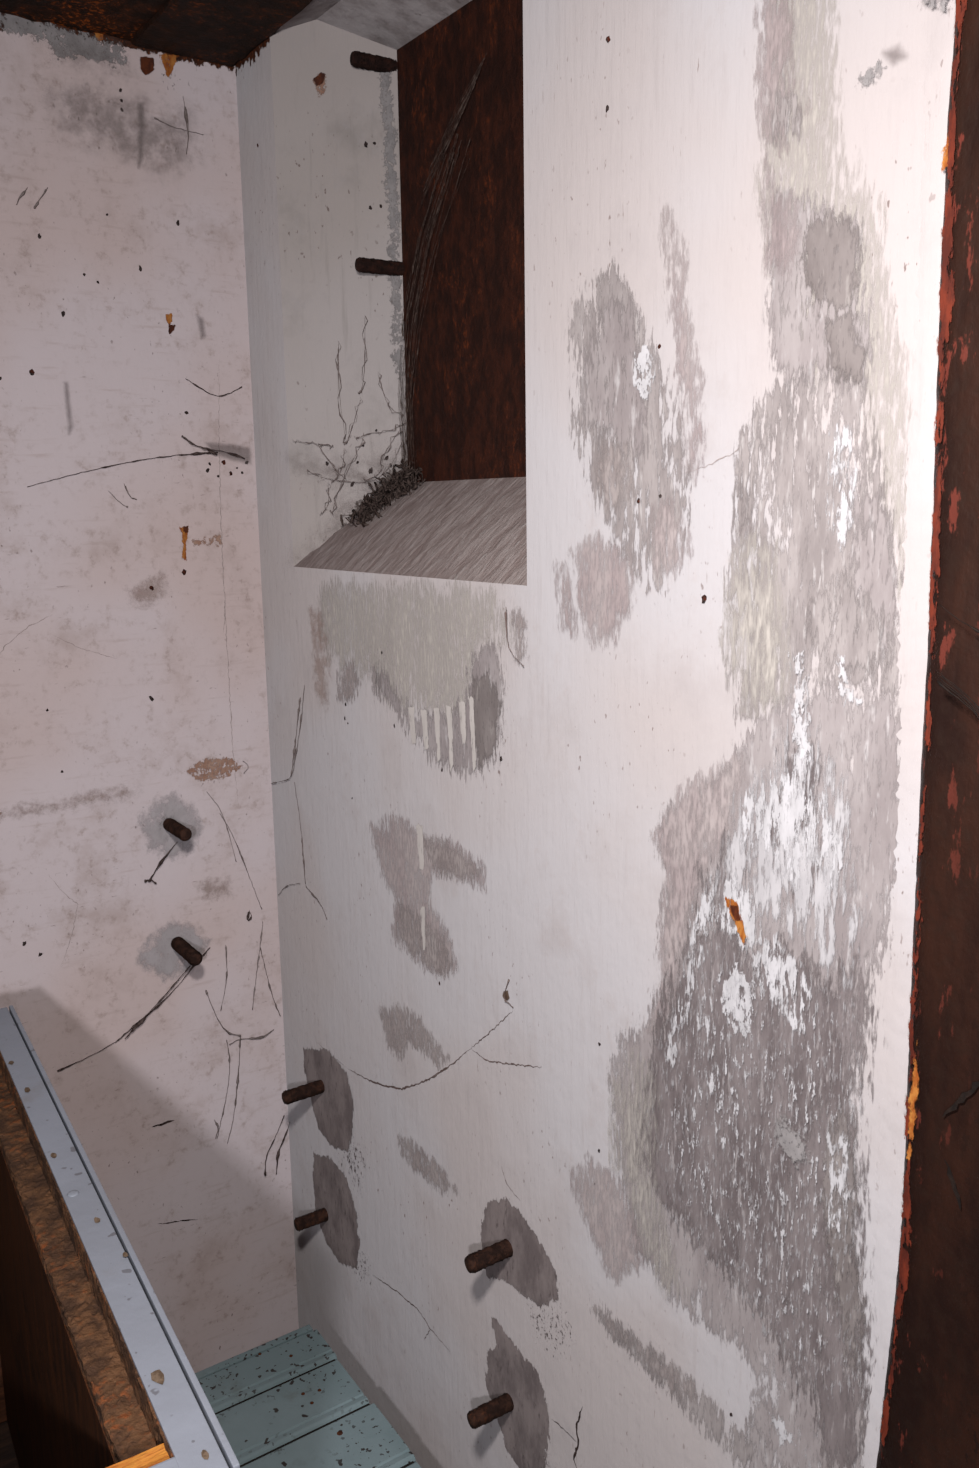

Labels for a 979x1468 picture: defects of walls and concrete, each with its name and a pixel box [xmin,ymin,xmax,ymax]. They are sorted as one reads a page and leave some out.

rust [159,53,179,77]
leakage [319,578,525,782]
leakage [555,0,910,1468]
peeling [142,796,201,856]
peeling [140,924,208,975]
leakage [371,815,486,980]
rust [725,897,746,943]
crack [319,1015,538,1090]
rust [906,1059,919,1160]